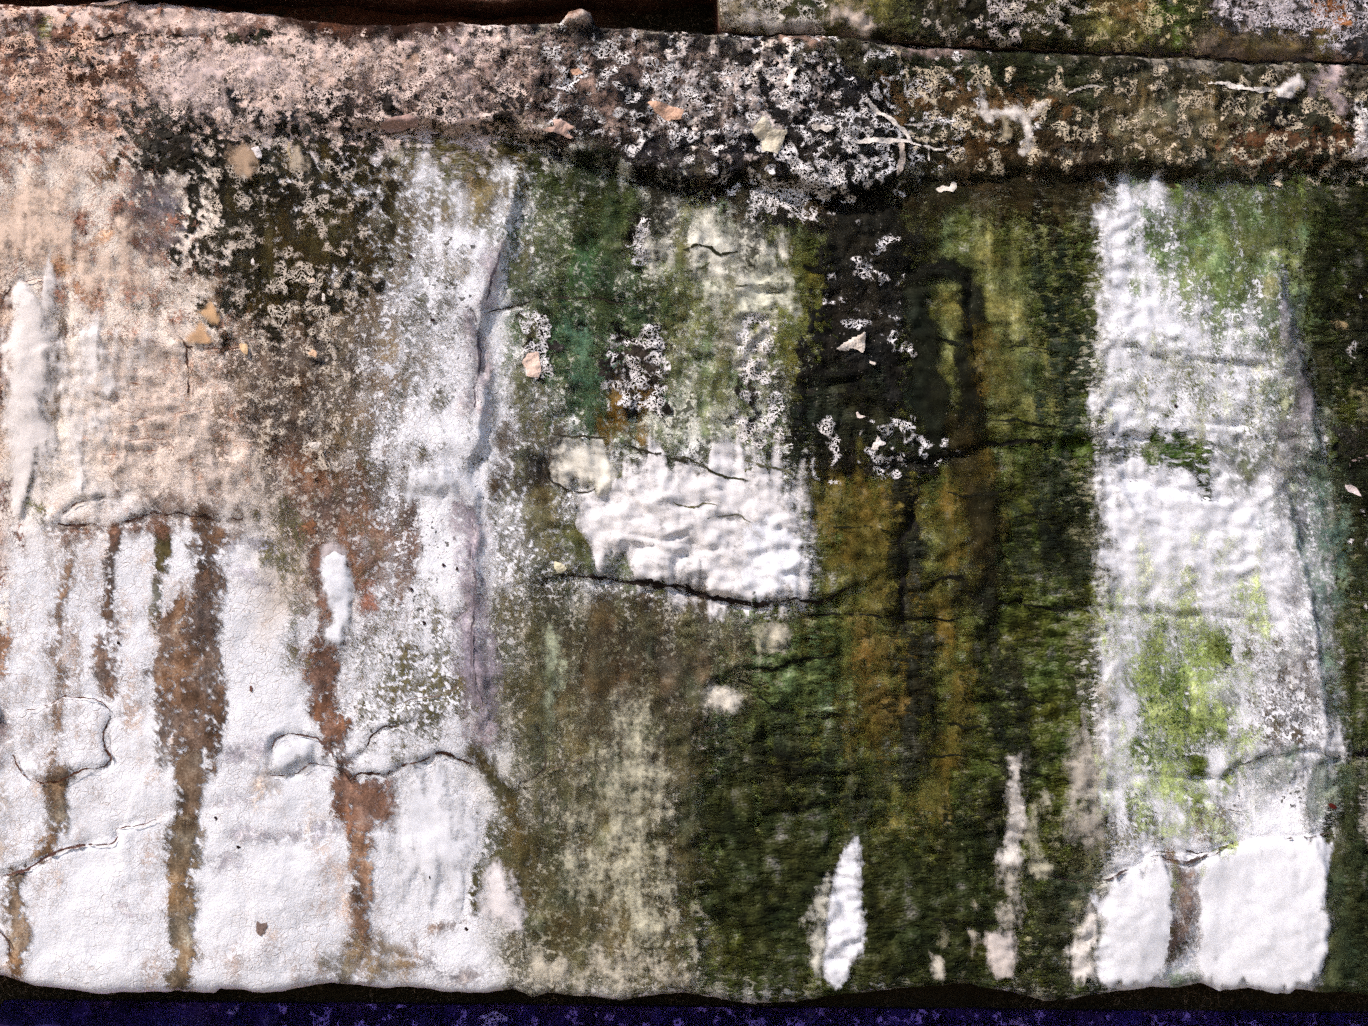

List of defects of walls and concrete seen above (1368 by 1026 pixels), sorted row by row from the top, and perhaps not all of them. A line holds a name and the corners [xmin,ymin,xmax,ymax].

water stain [508,134,625,341]
crack [683,243,769,287]
crack [803,264,824,273]
rust [0,460,26,590]
water stain [0,174,230,991]
rust [354,580,379,615]
crack [543,406,1203,633]
water stain [574,91,1368,995]
crack [12,695,113,784]
crack [4,819,156,876]
water stain [296,518,417,985]
water stain [0,524,1368,1026]